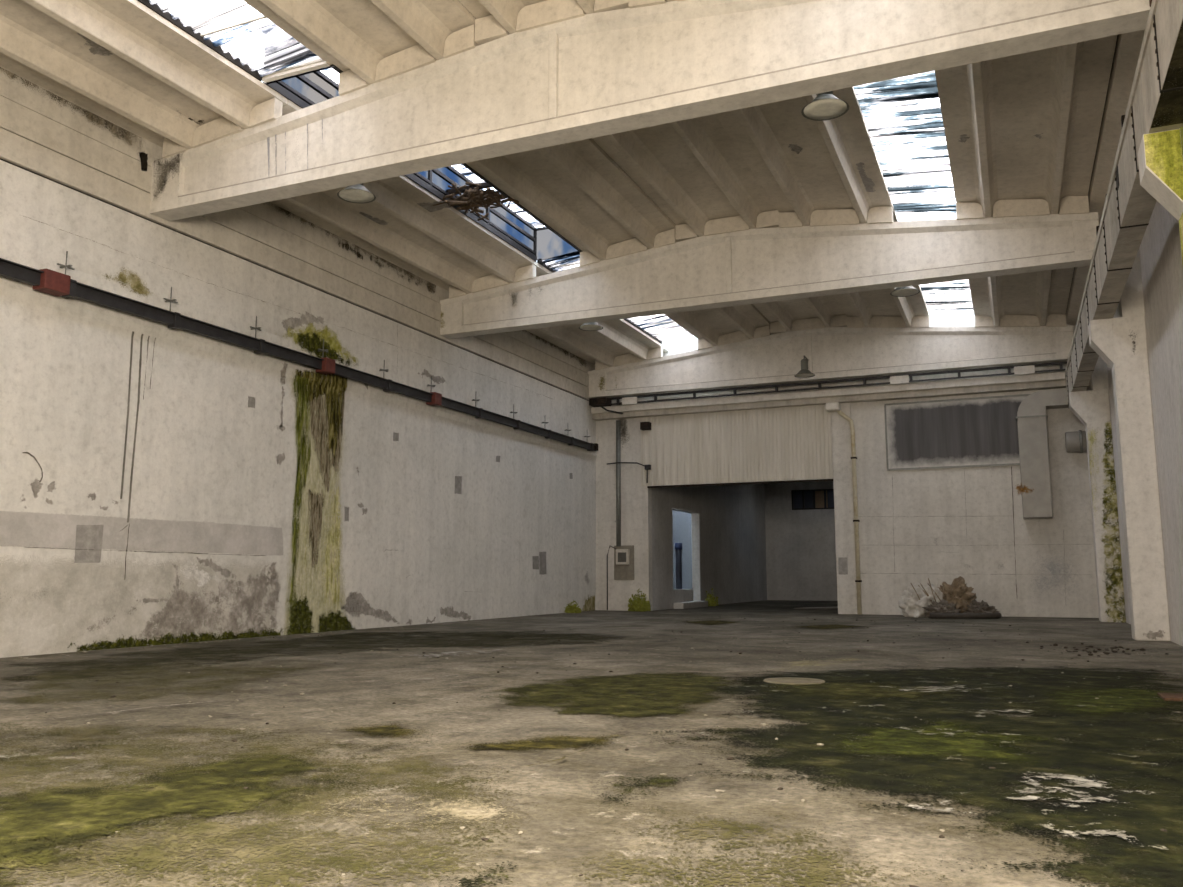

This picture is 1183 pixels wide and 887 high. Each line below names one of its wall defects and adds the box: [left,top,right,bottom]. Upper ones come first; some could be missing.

leakage [106,268,151,296]
leakage [0,331,625,707]
flaking render [82,557,281,646]
spalling [341,591,411,625]
spalling [426,606,471,624]